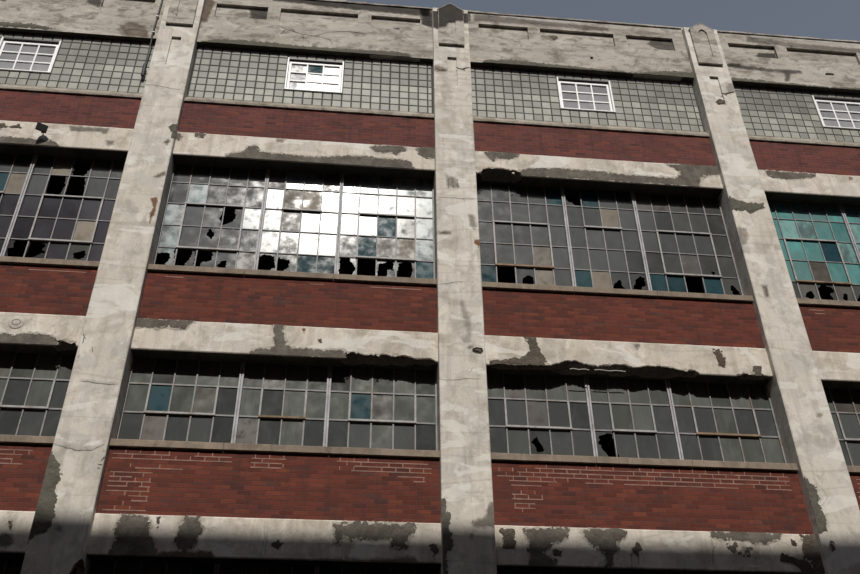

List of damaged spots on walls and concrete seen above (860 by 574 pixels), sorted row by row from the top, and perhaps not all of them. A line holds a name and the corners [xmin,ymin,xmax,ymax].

peeling [248,324,438,367]
spalling [489,336,700,379]
peeling [27,451,62,544]
peeling [102,448,233,556]
spalling [70,559,85,574]
peeling [331,520,417,551]
peeling [429,498,454,574]
peeling [499,526,627,568]
peeling [710,477,835,573]